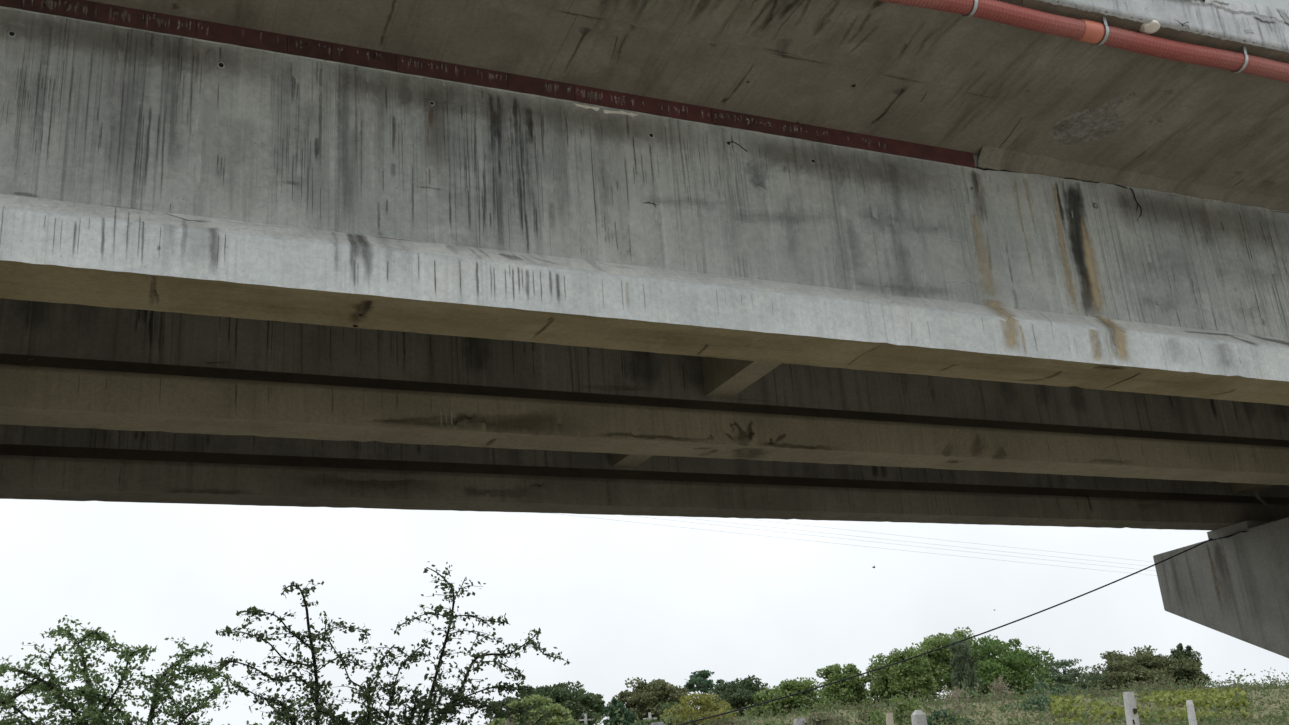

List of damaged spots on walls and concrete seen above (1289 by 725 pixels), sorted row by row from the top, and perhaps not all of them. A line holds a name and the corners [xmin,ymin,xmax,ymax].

water stain [468,92,630,264]
water stain [460,264,566,296]
rust [1055,185,1127,358]